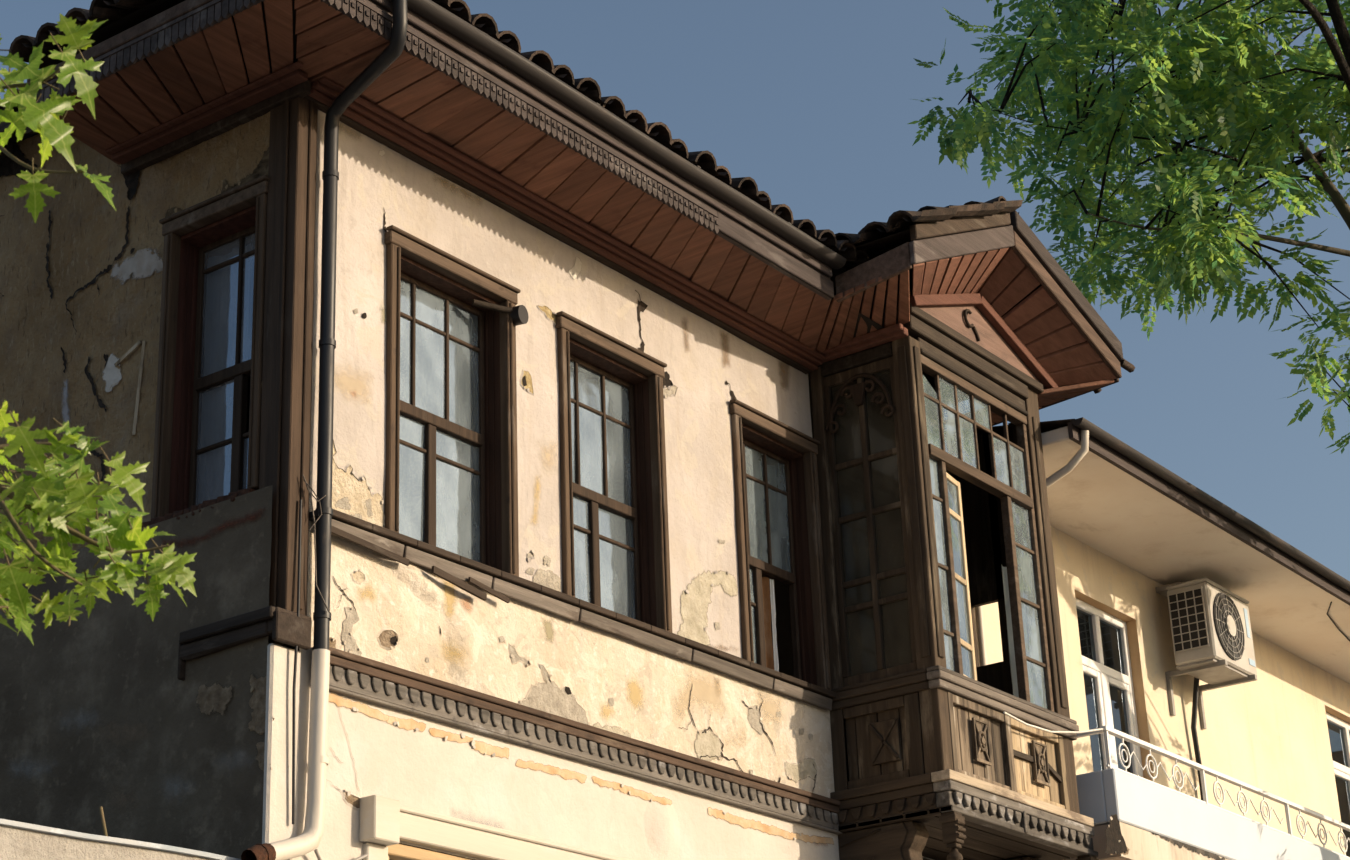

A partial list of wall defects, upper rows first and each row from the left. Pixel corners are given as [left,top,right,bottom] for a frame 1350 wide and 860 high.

crack [45,175,135,412]
crack [635,290,648,352]
peeling [329,607,362,656]
spalling [350,569,365,585]
spalling [376,628,401,650]
peeling [678,570,738,645]
peeling [499,636,631,738]
spalling [248,675,274,772]
peeling [329,693,672,805]
peeling [695,730,724,762]
peeling [748,705,781,735]